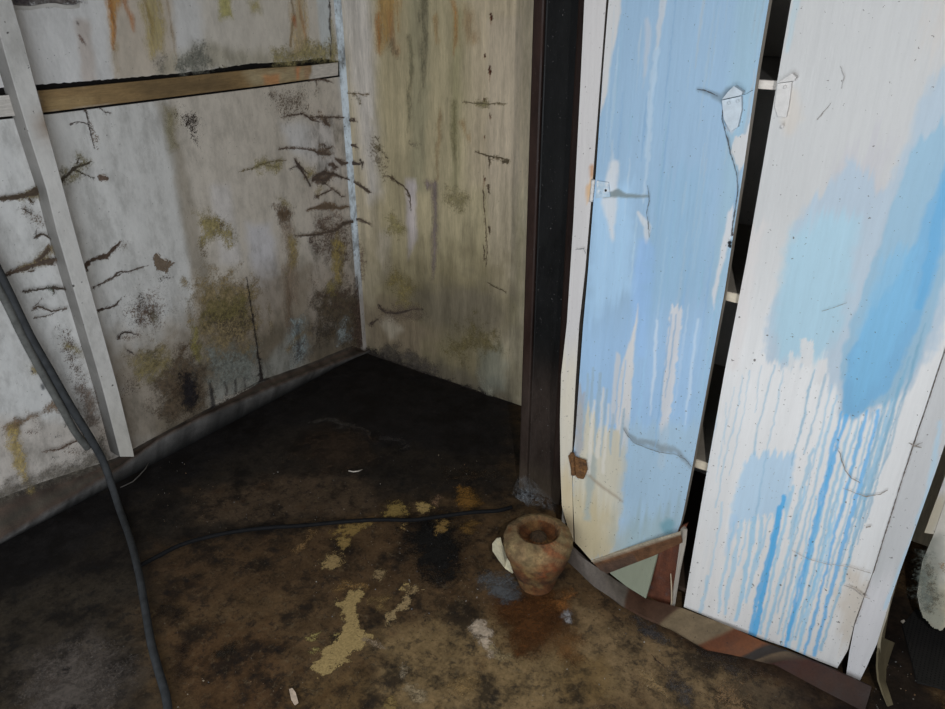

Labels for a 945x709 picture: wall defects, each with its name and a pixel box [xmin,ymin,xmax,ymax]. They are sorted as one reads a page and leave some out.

crack [61,107,110,183]
crack [239,78,412,239]
crack [0,186,67,319]
crack [84,240,145,313]
crack [117,328,144,356]
damp [120,215,269,426]
crack [246,277,268,382]